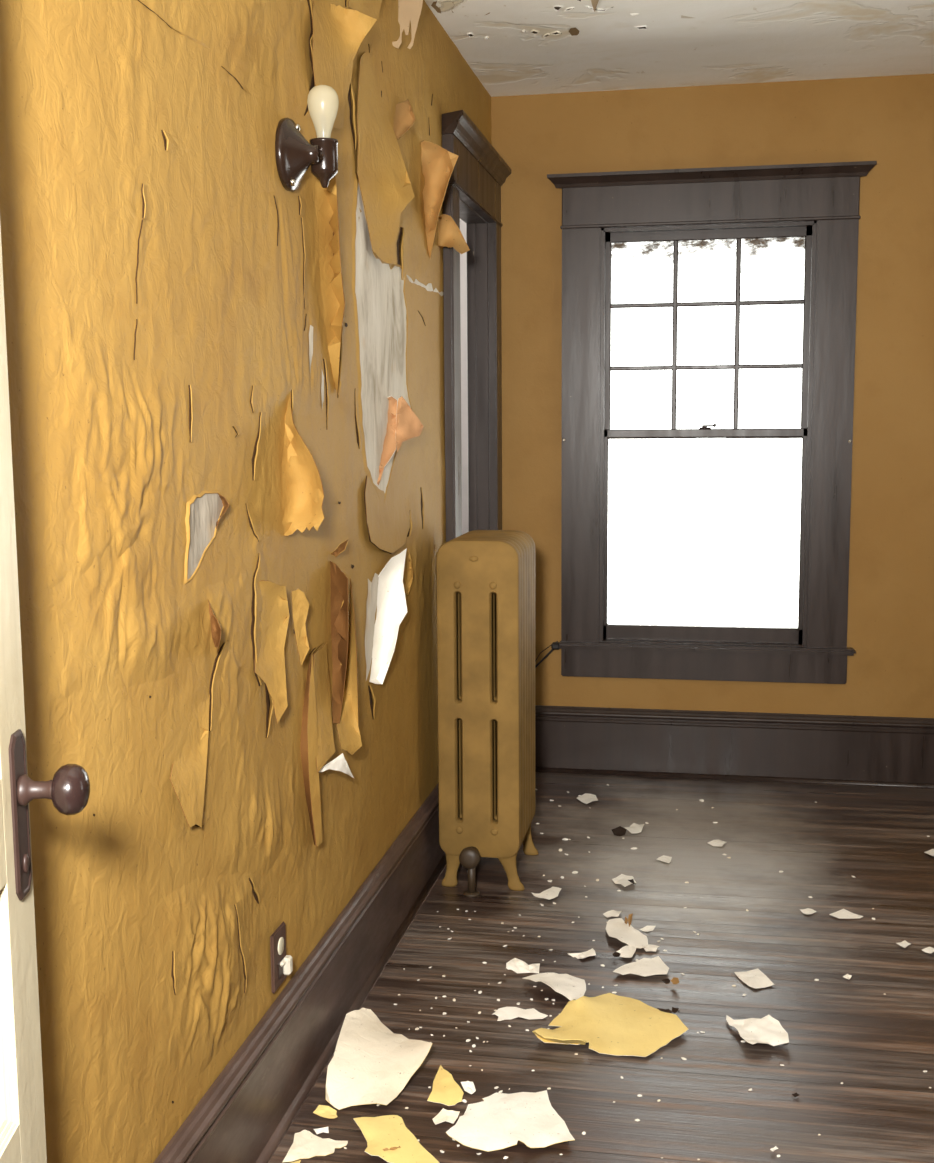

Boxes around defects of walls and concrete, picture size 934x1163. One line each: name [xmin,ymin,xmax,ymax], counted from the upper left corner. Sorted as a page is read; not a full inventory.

crack [138,0,251,95]
spalling [522,27,579,38]
crack [134,184,153,360]
flaking render [255,0,470,847]
flaking render [184,490,229,584]
peeling [208,600,221,650]
peeling [170,694,210,827]
crack [234,870,267,993]